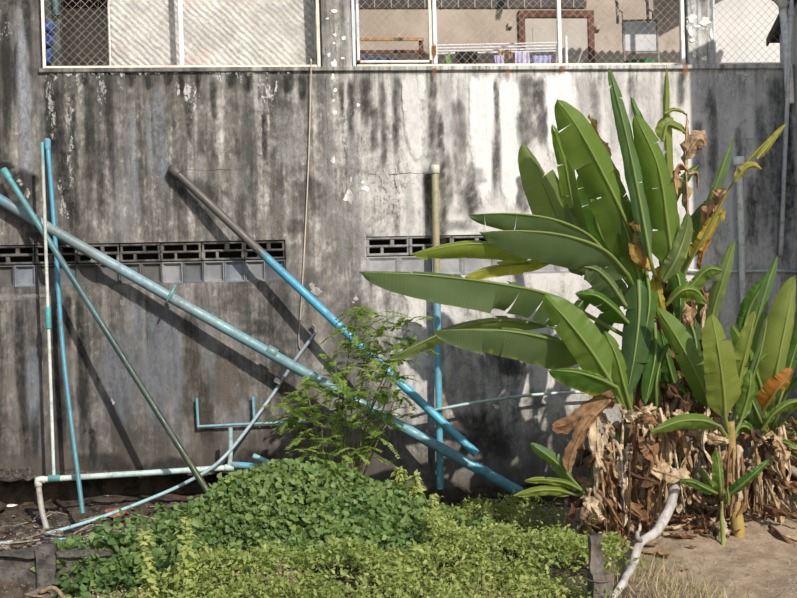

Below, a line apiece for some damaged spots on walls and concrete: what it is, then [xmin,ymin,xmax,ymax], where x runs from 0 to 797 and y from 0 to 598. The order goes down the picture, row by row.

damp [0,0,37,202]
damp [44,74,113,224]
damp [145,74,166,181]
damp [262,111,303,160]
damp [284,76,307,98]
damp [327,72,600,257]
peeling [686,6,713,61]
damp [748,84,794,246]
damp [16,314,39,453]
damp [51,296,129,470]
damp [132,304,212,435]
damp [145,458,187,470]